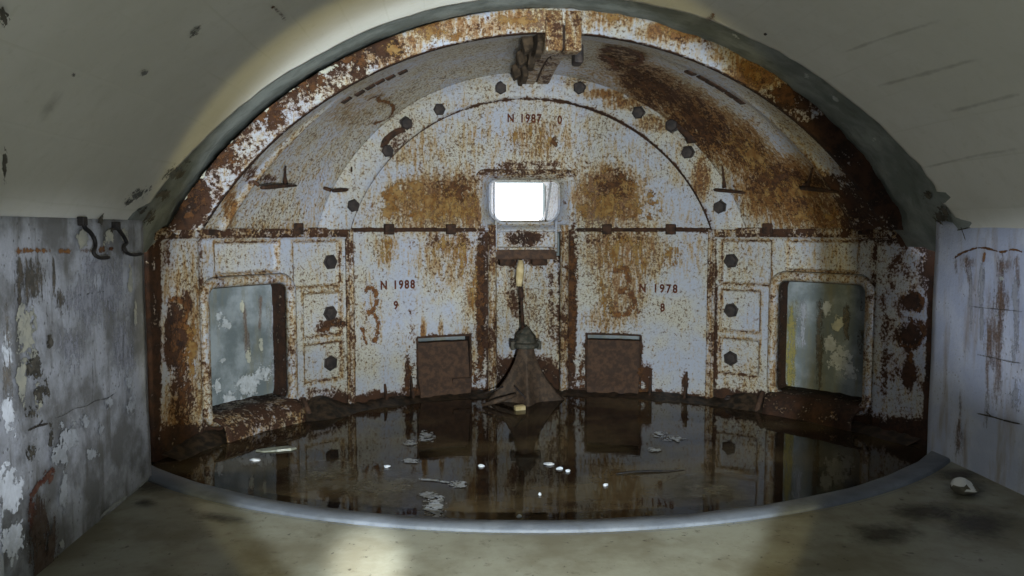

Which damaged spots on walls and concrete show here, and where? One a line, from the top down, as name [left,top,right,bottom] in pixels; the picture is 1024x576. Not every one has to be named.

peeling [0,7,10,27]
corrosion [292,73,327,96]
corrosion [382,40,403,58]
corrosion [416,27,462,41]
damp [14,251,136,385]
corrosion [169,295,198,426]
corrosion [371,173,485,389]
corrosion [568,235,579,376]
corrosion [576,164,681,333]
damp [1011,275,1019,362]
peeling [0,302,105,576]